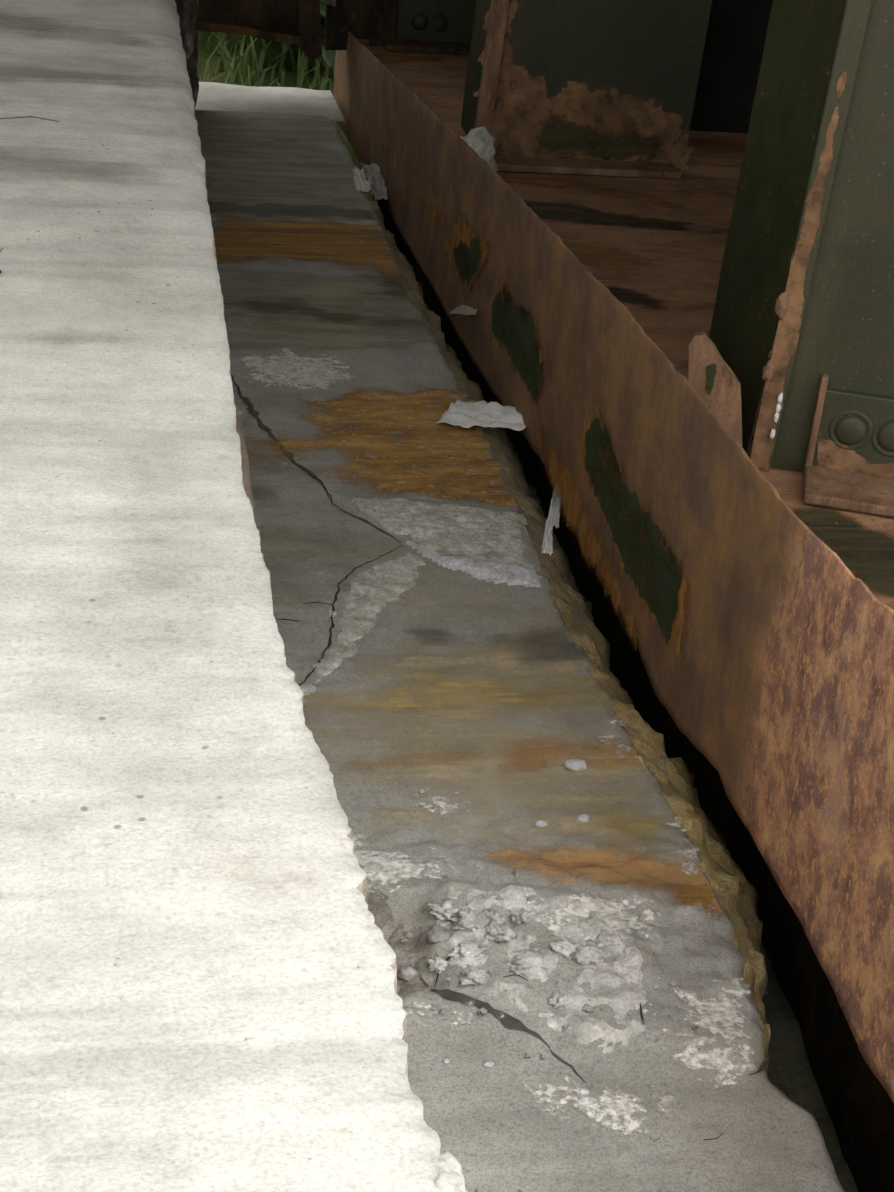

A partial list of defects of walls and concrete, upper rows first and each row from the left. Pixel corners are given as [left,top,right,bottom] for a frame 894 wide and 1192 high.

rust [213,217,400,278]
water stain [218,271,433,392]
spalling [368,189,486,402]
rust [444,214,490,292]
crack [231,374,402,686]
rust [536,426,689,658]
water stain [313,628,699,875]
spalling [300,427,771,1073]
water stain [352,835,451,893]
rust [488,845,723,914]
crack [420,956,586,1083]
water stain [663,976,756,1087]